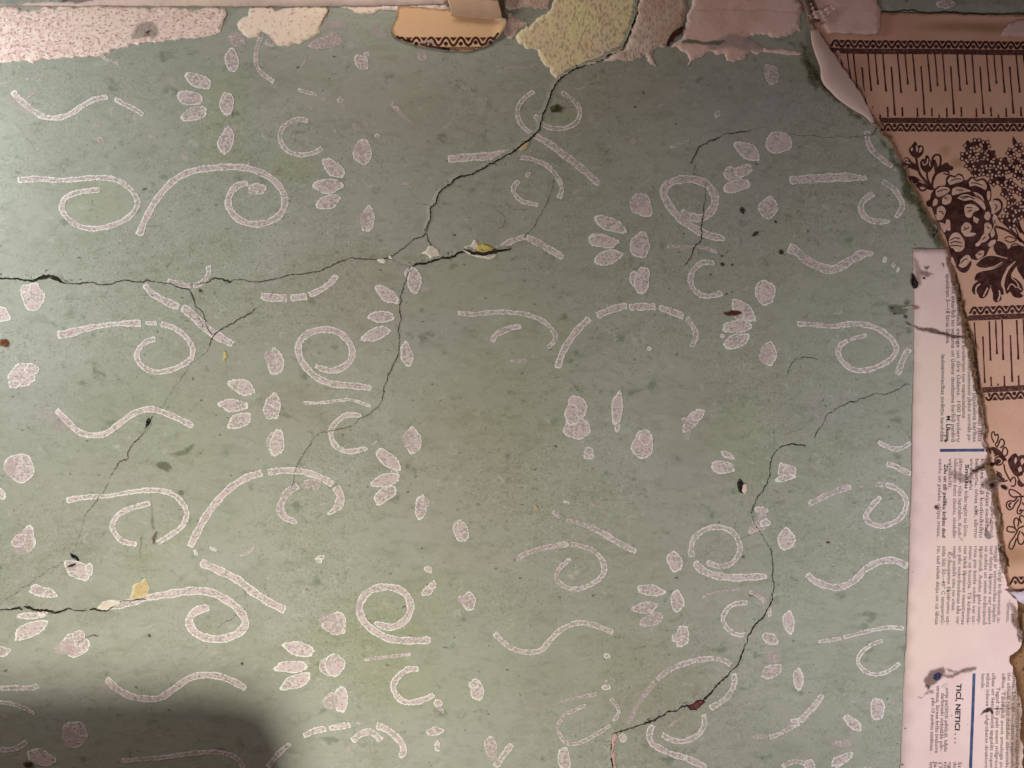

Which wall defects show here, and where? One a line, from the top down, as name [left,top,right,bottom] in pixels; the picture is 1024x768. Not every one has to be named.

spalling [516,0,688,78]
peeling [810,29,874,123]
crack [0,0,638,487]
crack [87,401,166,512]
crack [0,587,146,641]
crack [606,384,910,768]